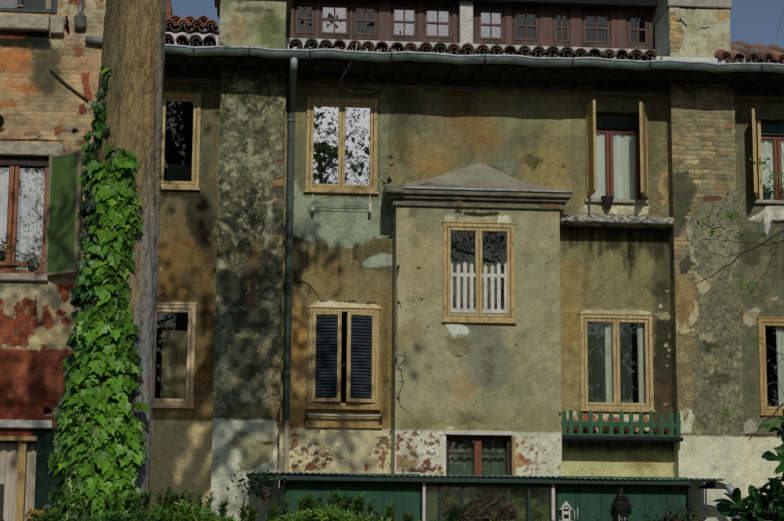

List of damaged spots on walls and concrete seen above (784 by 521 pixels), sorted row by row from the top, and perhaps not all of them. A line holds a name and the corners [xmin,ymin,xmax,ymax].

flaking render [748,204,784,237]
leakage [564,226,670,304]
spalling [564,83,737,436]
peeling [0,281,75,351]
leakage [216,270,276,390]
crack [396,265,406,407]
peeling [445,323,488,357]
leakage [653,319,673,407]
peeling [289,429,341,471]
peeling [365,430,443,475]
peeling [516,436,554,475]